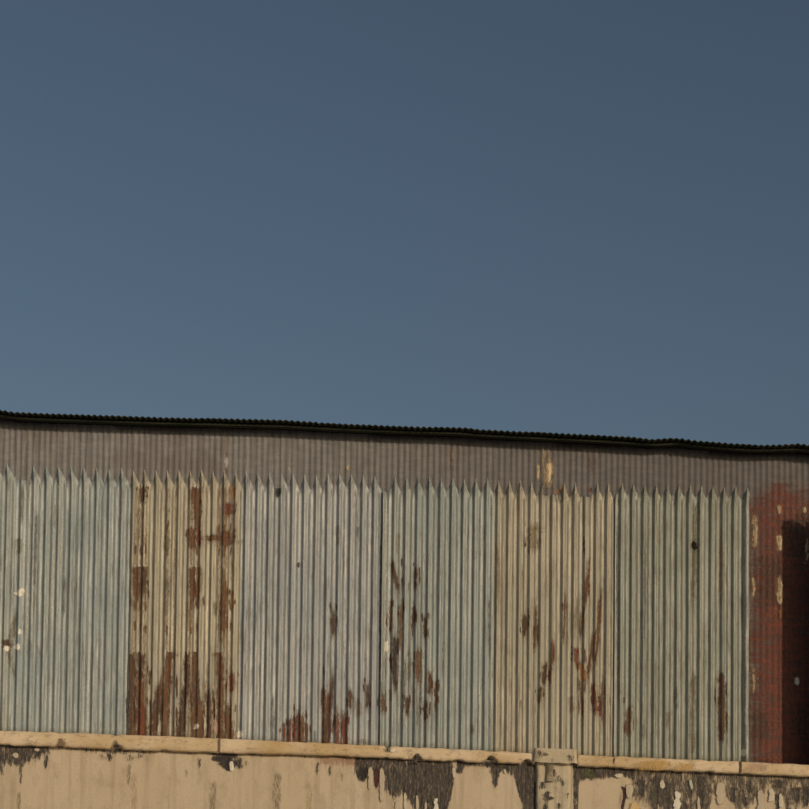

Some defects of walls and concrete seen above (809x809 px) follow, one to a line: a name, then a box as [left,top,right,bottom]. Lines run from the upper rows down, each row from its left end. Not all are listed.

corrosion [126,484,243,739]
corrosion [271,598,440,744]
corrosion [391,559,421,589]
corrosion [520,607,539,650]
corrosion [535,641,555,703]
corrosion [575,537,590,633]
corrosion [570,595,611,719]
corrosion [749,475,809,765]
corrosion [715,673,729,741]
flaking render [0,738,66,783]
flaking render [320,748,536,809]
flaking render [573,765,809,809]